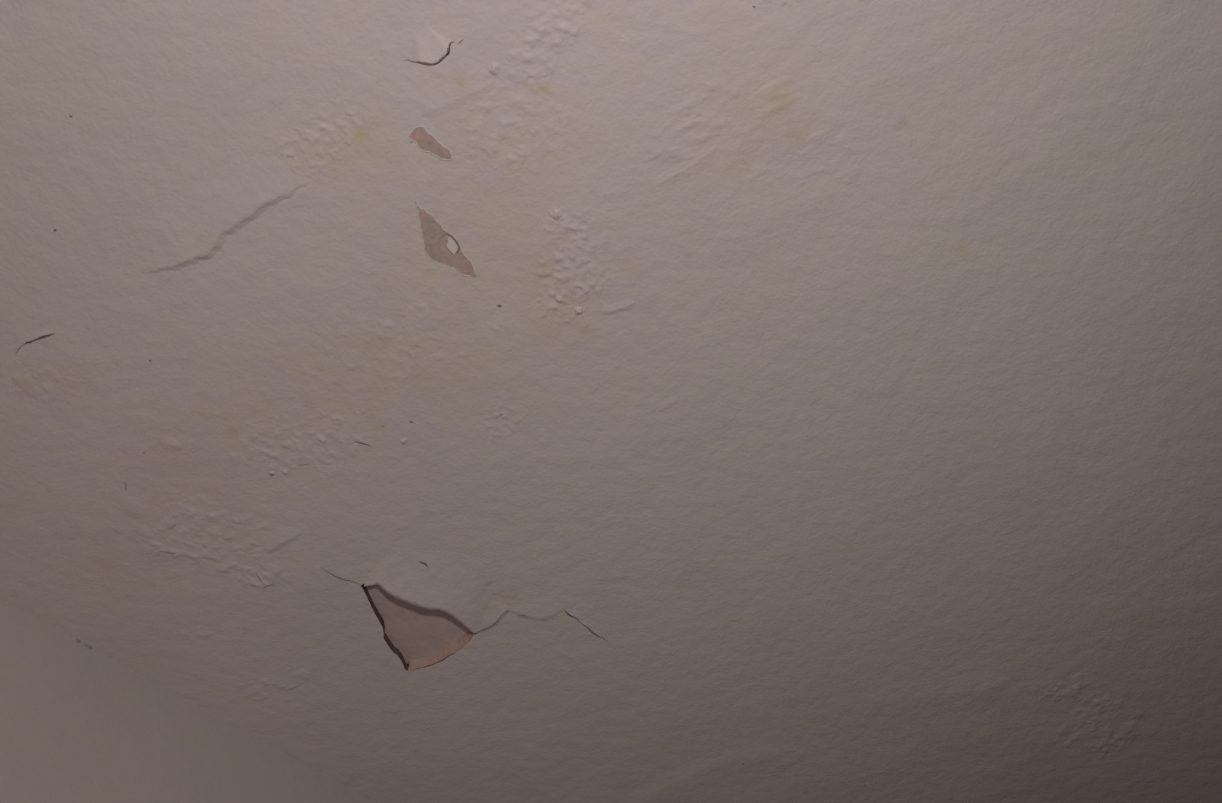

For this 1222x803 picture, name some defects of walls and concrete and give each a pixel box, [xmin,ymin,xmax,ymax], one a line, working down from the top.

peeling [408,125,453,161]
peeling [415,200,478,278]
crack [14,329,55,353]
flaking render [364,583,473,671]
crack [564,610,606,641]